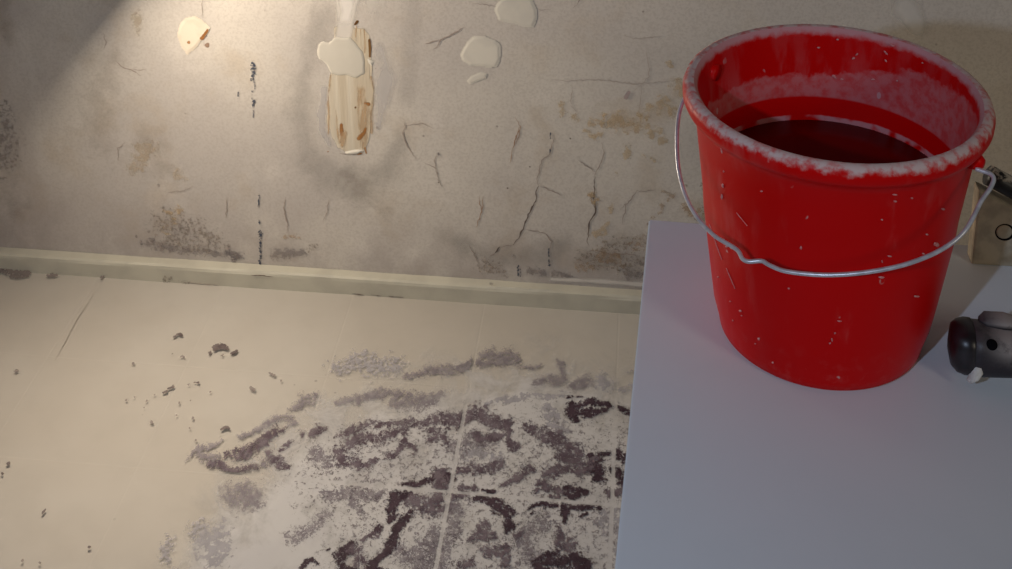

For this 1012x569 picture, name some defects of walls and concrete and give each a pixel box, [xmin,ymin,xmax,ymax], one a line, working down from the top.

spalling [317,0,374,155]
crack [402,118,442,186]
crack [469,138,560,264]
crack [510,117,521,162]
crack [580,146,638,261]